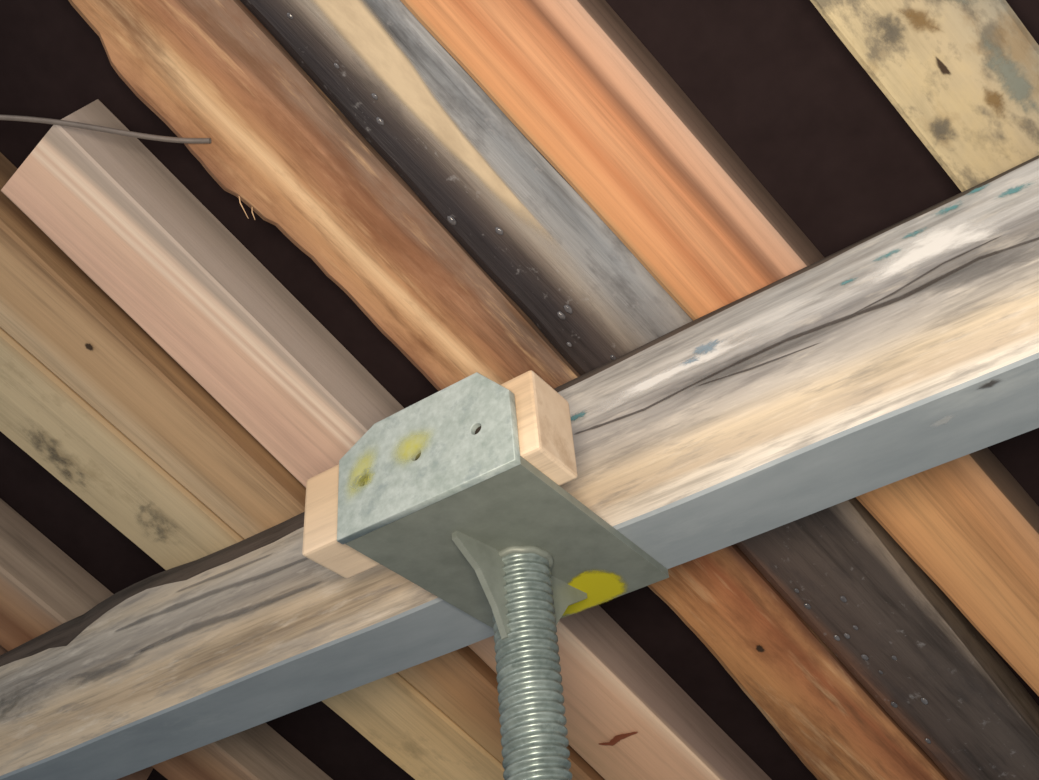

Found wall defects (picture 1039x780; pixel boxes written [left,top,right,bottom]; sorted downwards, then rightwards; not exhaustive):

water stain [877,10,939,42]
water stain [986,42,1035,108]
water stain [934,120,950,139]
crack [575,236,1039,434]
water stain [35,436,82,477]